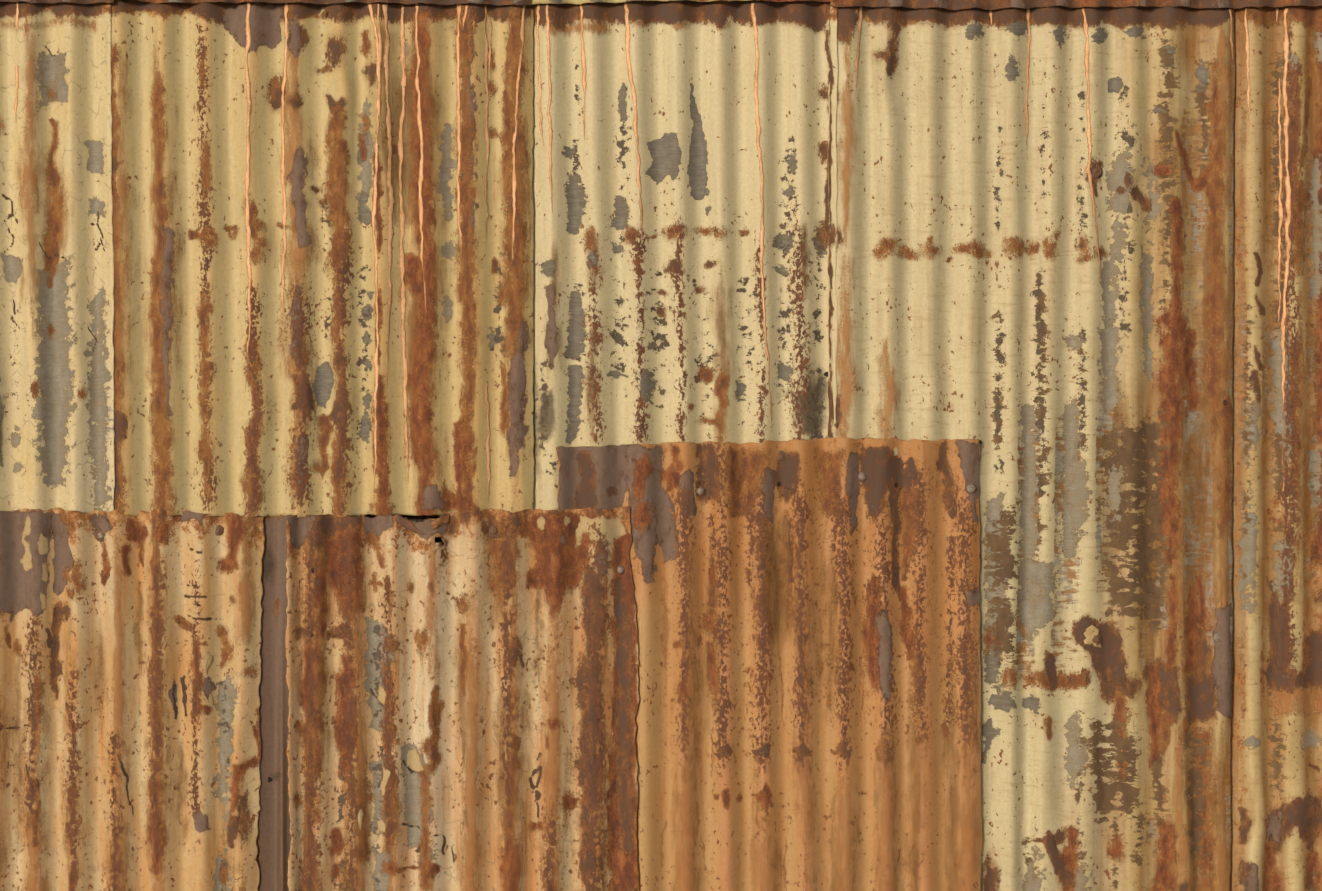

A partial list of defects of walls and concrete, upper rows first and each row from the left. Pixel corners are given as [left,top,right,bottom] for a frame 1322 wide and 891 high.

peeling [35,51,70,112]
rust [316,30,347,74]
rust [874,229,1060,263]
peeling [0,252,113,543]
peeling [486,82,829,591]
rust [827,289,857,438]
peeling [0,511,74,622]
rust [414,516,457,656]
rust [0,559,87,891]
peeling [336,604,439,891]
peeling [1063,710,1215,891]
rust [1237,790,1322,891]